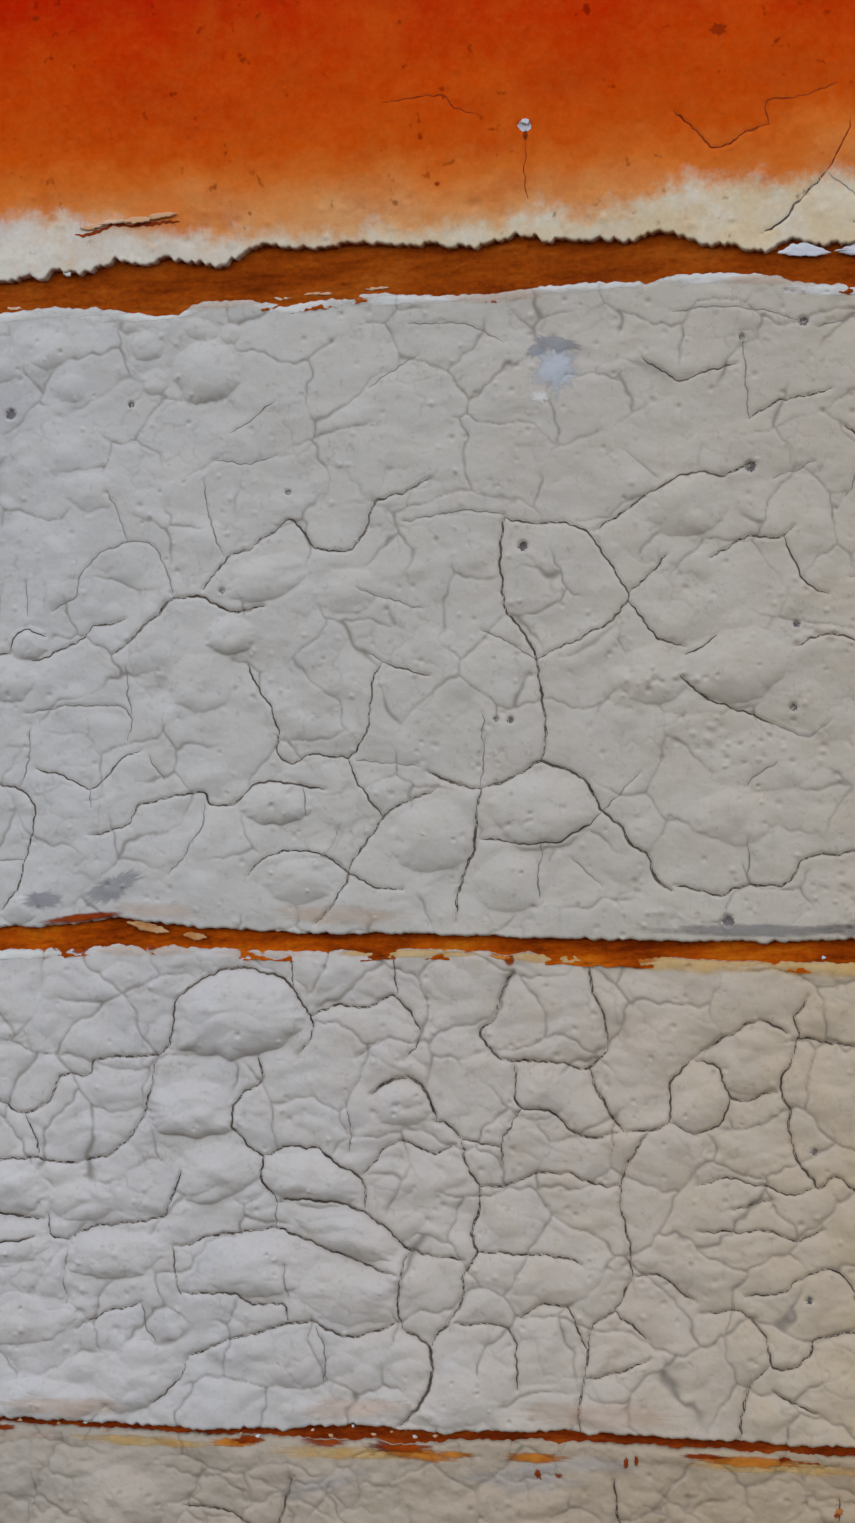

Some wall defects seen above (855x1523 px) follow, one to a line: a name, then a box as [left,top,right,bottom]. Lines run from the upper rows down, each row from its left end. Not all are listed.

crack [673,82,837,148]
crack [762,123,855,233]
peeling [75,212,180,238]
peeling [0,233,855,322]
crack [371,321,503,386]
crack [642,305,855,419]
crack [0,400,855,924]
rust [0,912,855,975]
crack [0,959,855,1436]
rust [0,1416,855,1479]
crack [186,1478,292,1523]
crack [613,1481,621,1523]